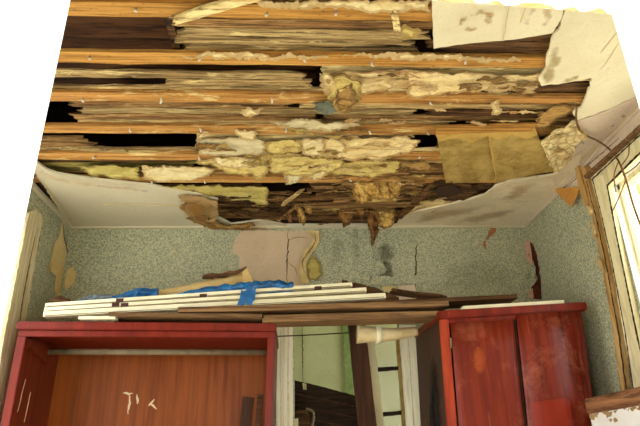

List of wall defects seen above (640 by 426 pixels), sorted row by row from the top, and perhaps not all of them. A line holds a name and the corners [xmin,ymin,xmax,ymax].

peeling [312,69,540,115]
peeling [540,120,587,174]
flaking render [587,112,640,168]
flaking render [232,230,313,286]
crack [286,233,307,282]
flaking render [525,240,542,300]